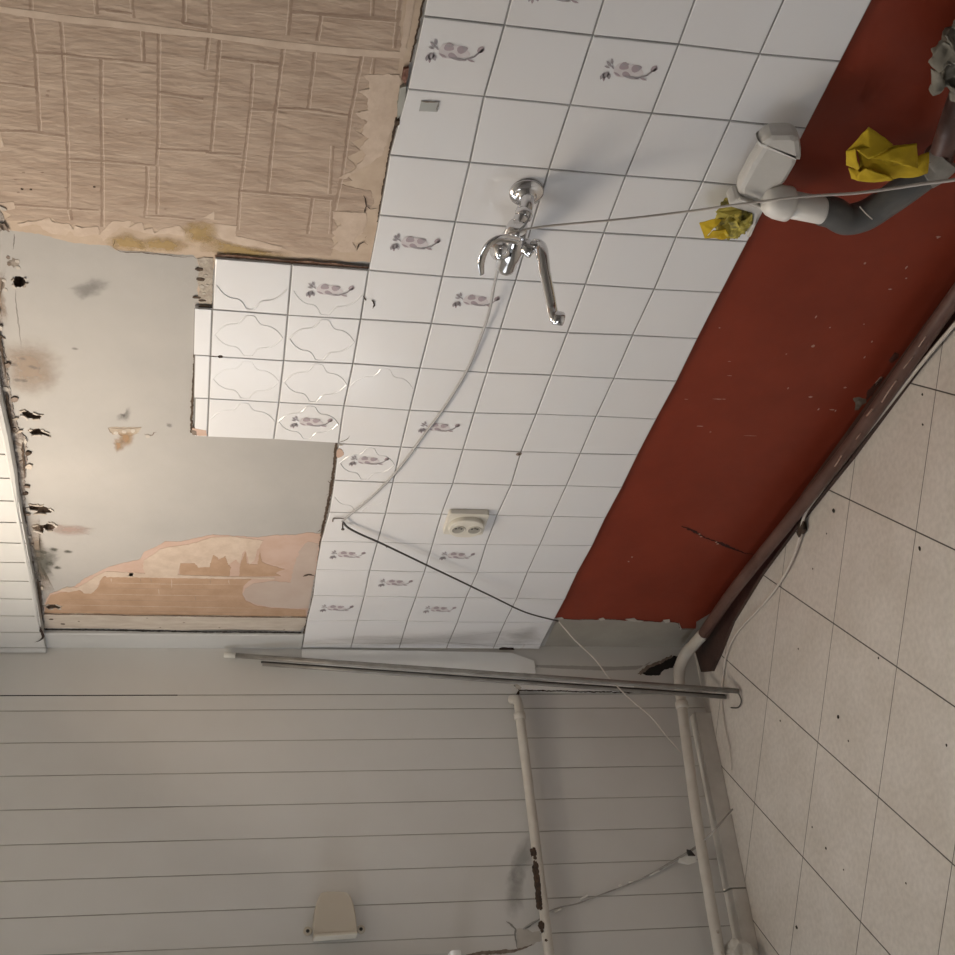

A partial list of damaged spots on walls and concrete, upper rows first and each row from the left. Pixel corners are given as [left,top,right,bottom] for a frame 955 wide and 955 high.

spalling [394,66,409,126]
spalling [0,205,9,232]
spalling [0,256,28,292]
spalling [192,257,213,306]
flaking render [0,309,306,633]
crack [682,526,754,555]